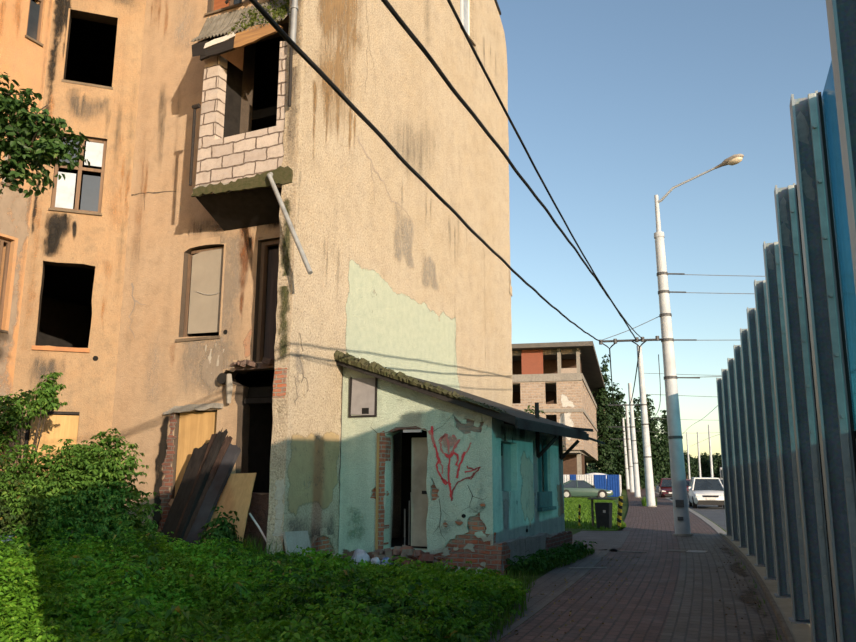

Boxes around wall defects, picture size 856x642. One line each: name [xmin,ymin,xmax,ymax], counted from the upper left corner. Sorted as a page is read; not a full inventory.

water stain [313,0,357,146]
crack [357,136,411,228]
water stain [48,214,76,251]
flaking render [444,409,487,440]
flaking render [434,503,511,575]